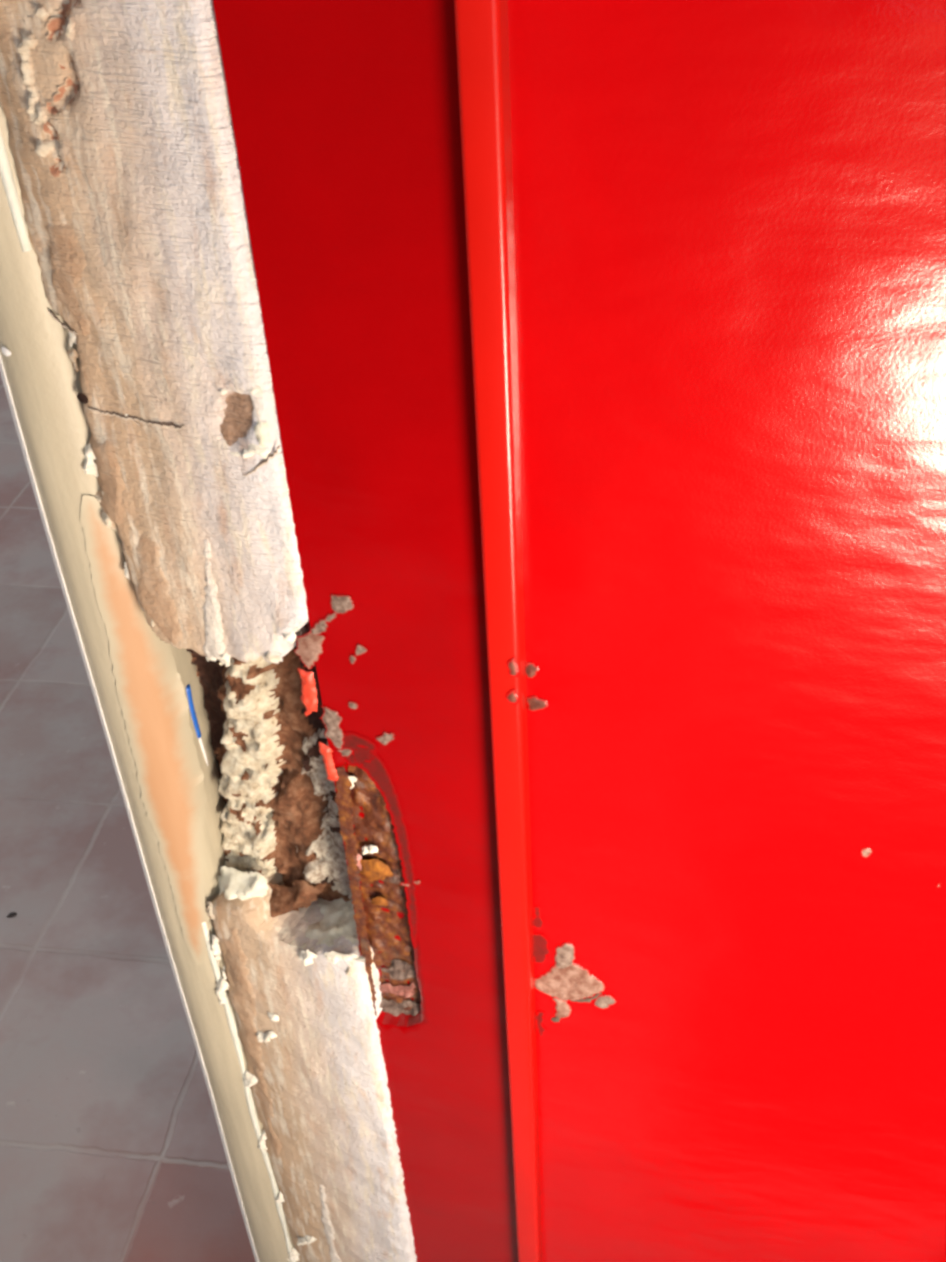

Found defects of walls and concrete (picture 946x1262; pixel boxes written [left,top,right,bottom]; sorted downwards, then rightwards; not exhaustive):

crack [88,406,185,430]
spalling [216,385,271,460]
crack [243,445,280,476]
spalling [83,444,116,529]
peeling [349,644,369,665]
peeling [375,731,395,745]
spalling [186,594,365,1005]
corrosion [335,732,421,1016]
peeling [535,942,617,1022]
flaking render [256,1012,279,1042]
flaking render [258,1130,267,1151]
flaking render [287,1235,317,1262]